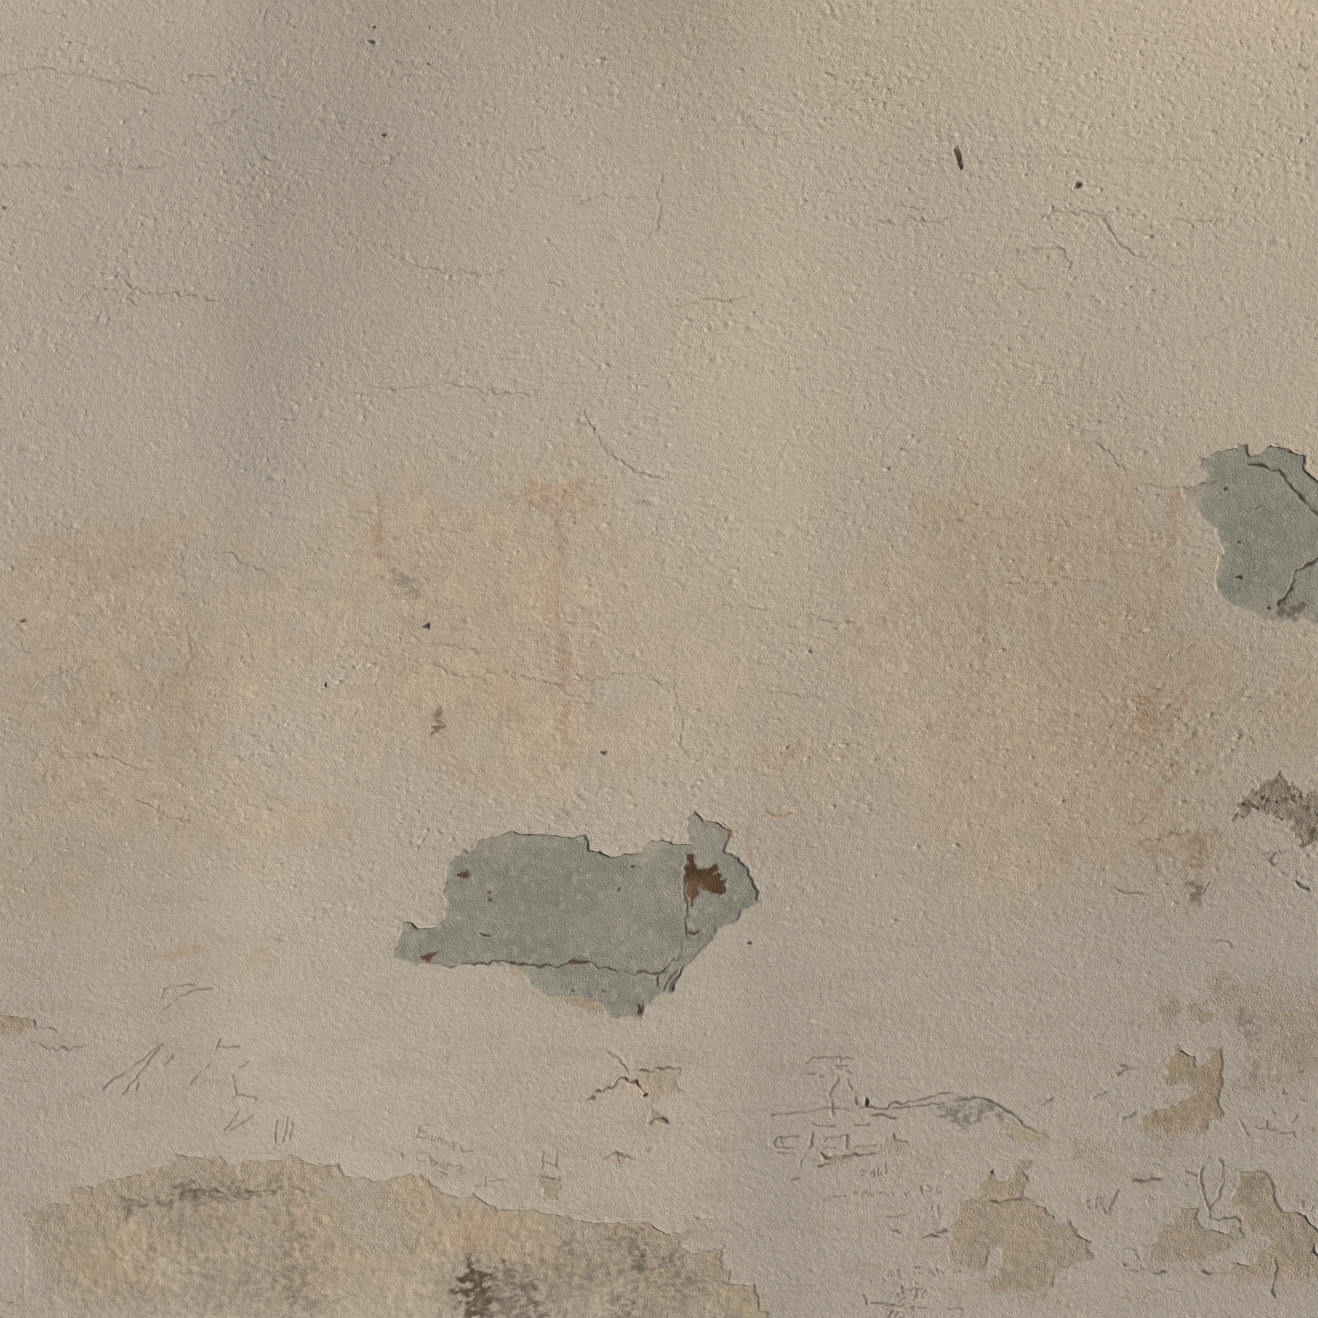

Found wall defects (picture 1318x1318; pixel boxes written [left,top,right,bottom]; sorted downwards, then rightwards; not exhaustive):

peeling [1179,440,1318,625]
peeling [1238,770,1318,867]
peeling [391,809,760,1021]
peeling [0,1011,36,1059]
crack [850,1091,1049,1145]
peeling [1114,965,1318,1151]
peeling [4,1150,770,1318]
peeling [920,1158,1094,1305]
peeling [1119,1163,1318,1302]